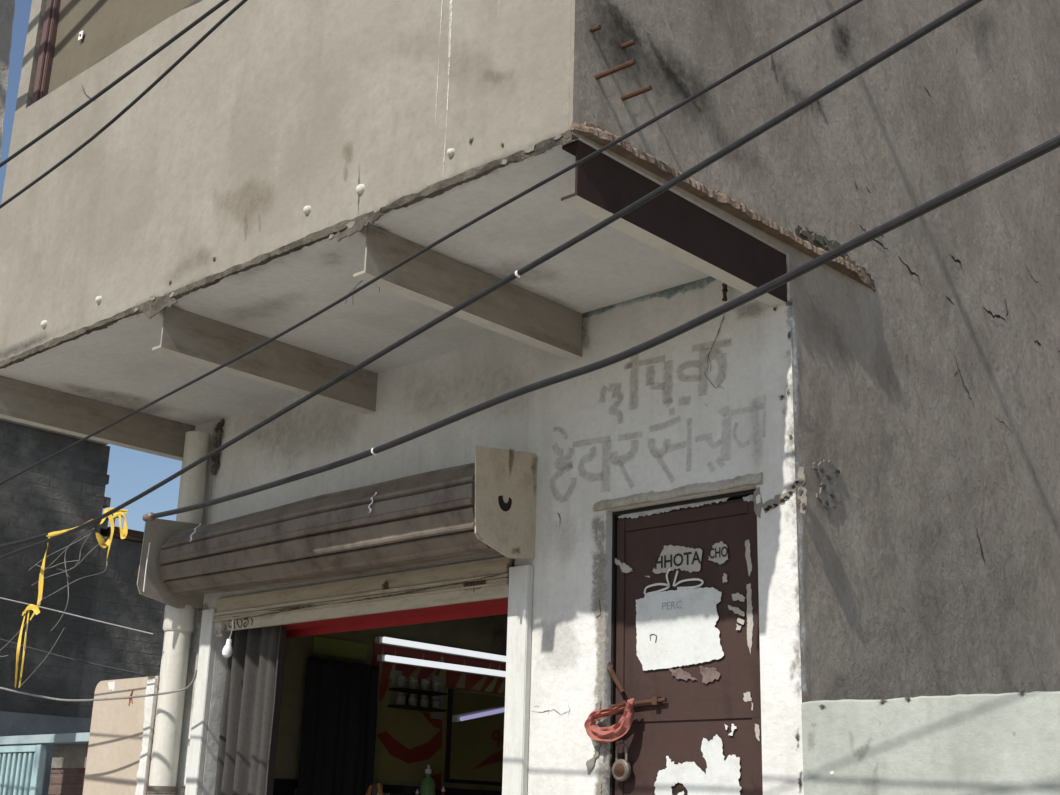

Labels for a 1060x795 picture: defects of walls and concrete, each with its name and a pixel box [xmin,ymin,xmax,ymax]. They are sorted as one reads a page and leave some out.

spalling [501,133,572,165]
spalling [328,207,384,242]
crack [860,225,921,284]
spalling [134,281,178,319]
crack [984,300,1008,323]
peeling [753,459,842,518]